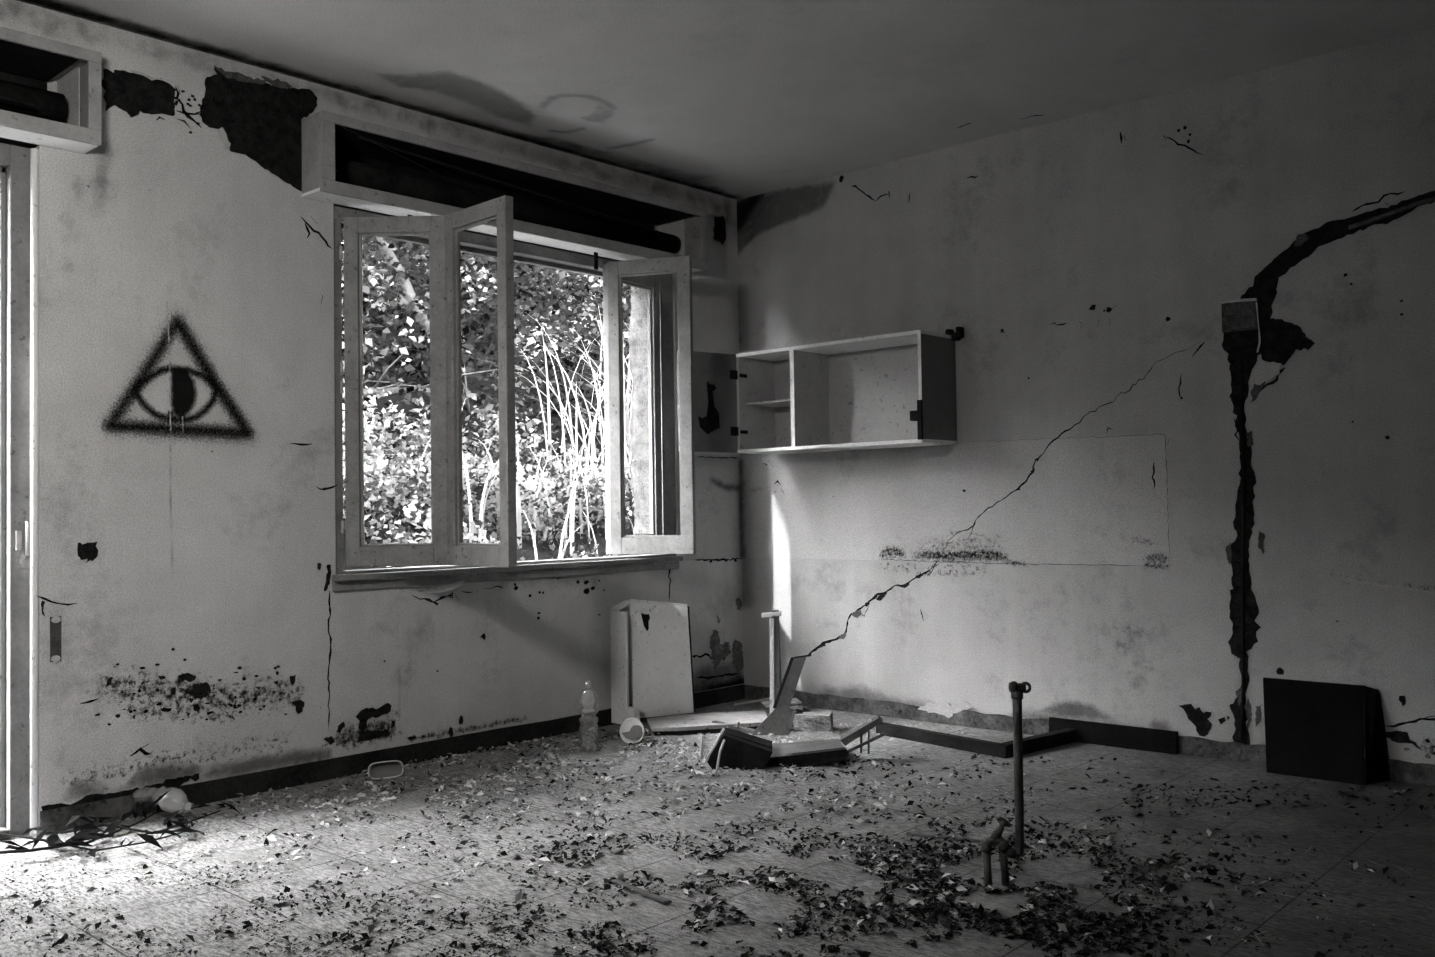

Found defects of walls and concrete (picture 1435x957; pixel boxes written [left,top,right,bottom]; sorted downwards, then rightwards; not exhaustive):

spalling [102,69,175,117]
spalling [199,66,317,192]
crack [1353,191,1405,211]
crack [1234,367,1285,440]
crack [808,341,1205,655]
crack [1383,716,1435,727]